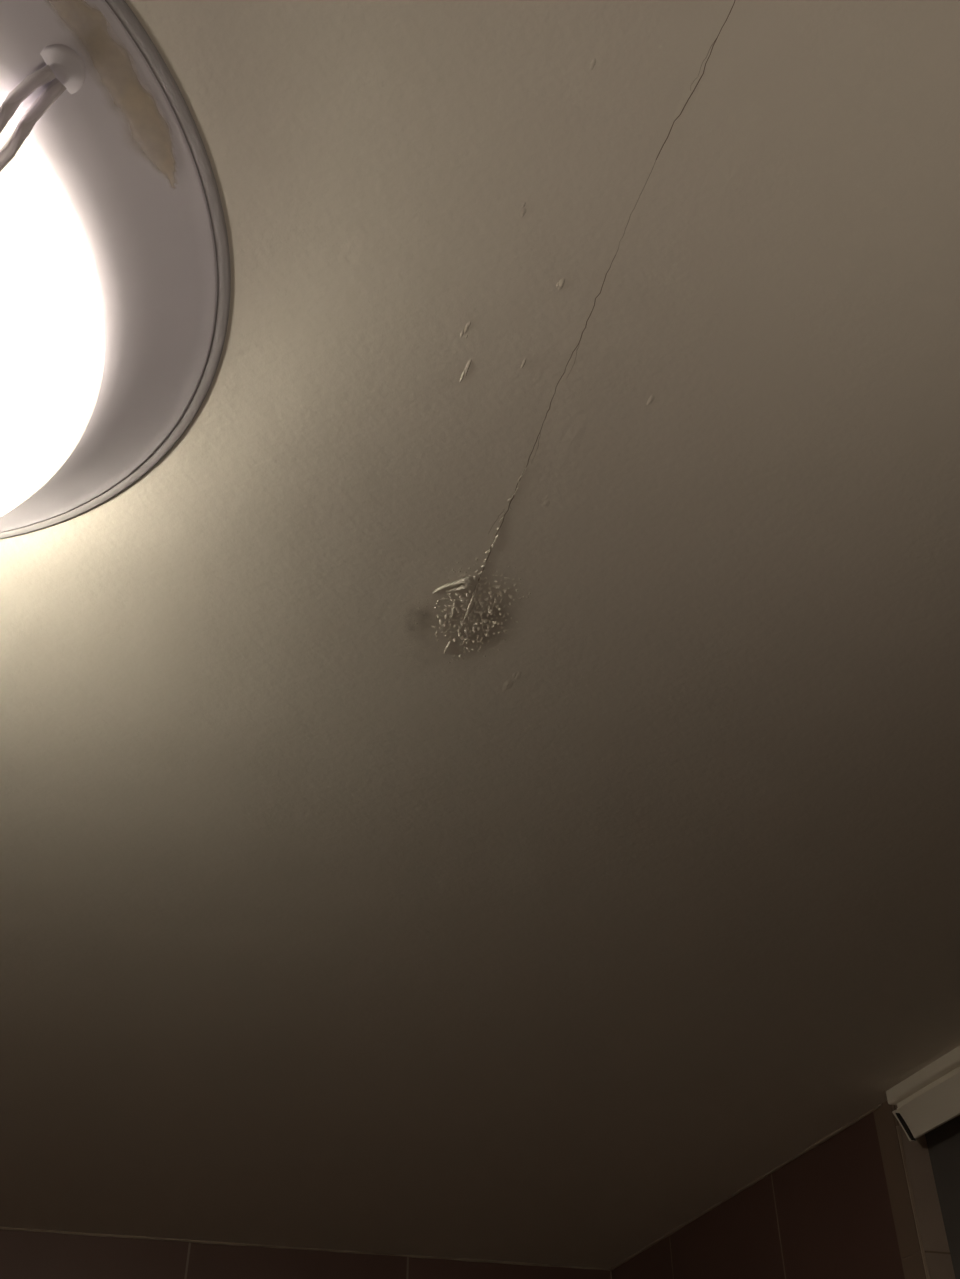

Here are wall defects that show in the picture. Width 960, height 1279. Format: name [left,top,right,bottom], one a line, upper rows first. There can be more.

crack [478,1,735,581]
peeling [413,558,531,663]